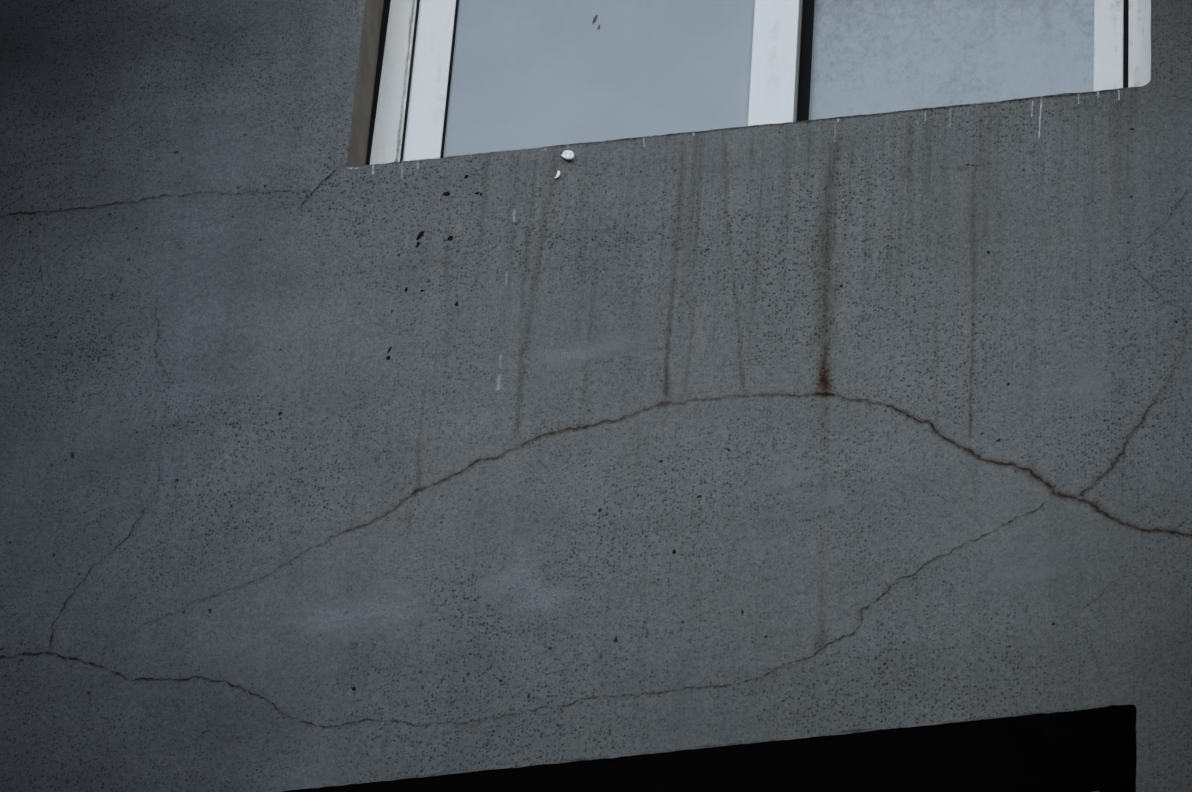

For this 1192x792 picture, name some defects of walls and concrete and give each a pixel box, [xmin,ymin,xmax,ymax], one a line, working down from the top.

crack [2,194,191,217]
crack [0,393,1182,727]